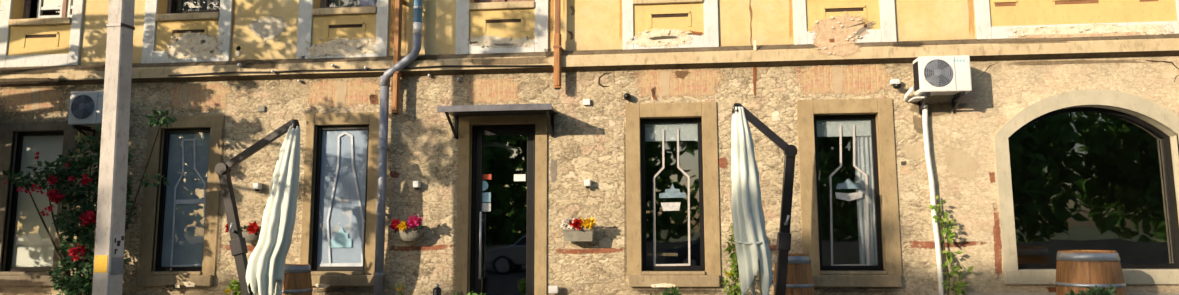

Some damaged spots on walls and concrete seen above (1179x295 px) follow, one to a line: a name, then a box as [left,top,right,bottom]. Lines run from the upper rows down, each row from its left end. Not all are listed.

peeling [166,31,241,61]
peeling [249,16,287,41]
peeling [301,37,377,59]
peeling [627,28,703,47]
flaking render [794,11,890,96]